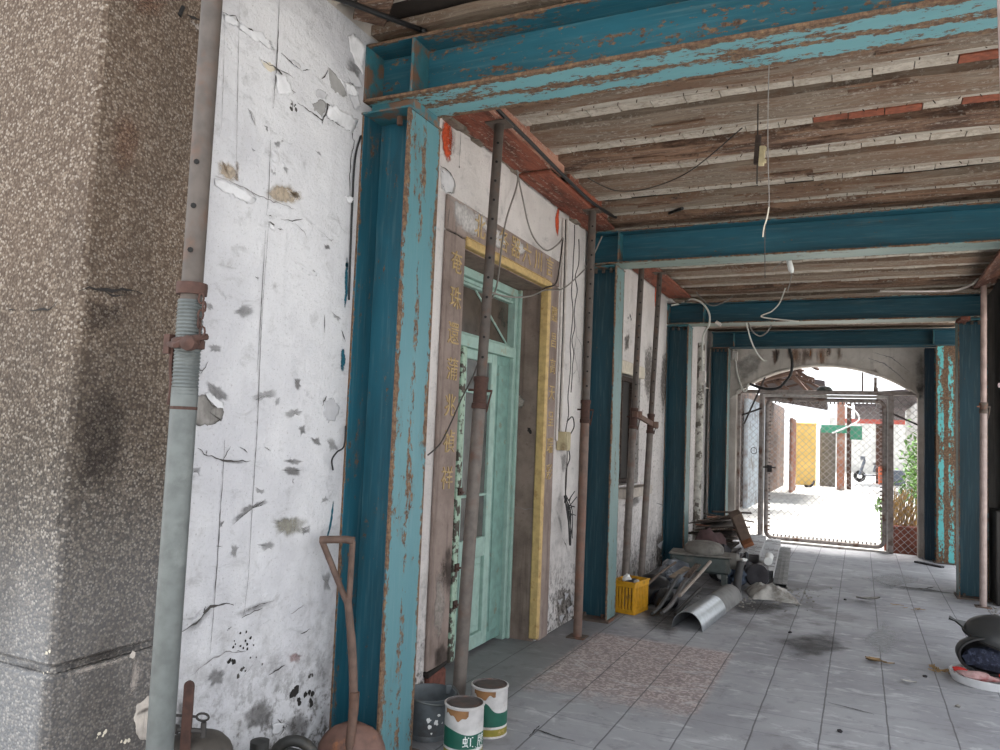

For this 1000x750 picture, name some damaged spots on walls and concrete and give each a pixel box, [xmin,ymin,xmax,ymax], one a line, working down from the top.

crack [222,34,239,111]
crack [272,16,280,95]
spalling [223,12,366,142]
spalling [215,176,302,231]
crack [79,286,143,297]
spalling [196,387,225,426]
crack [182,142,271,676]
leakage [791,636,835,655]